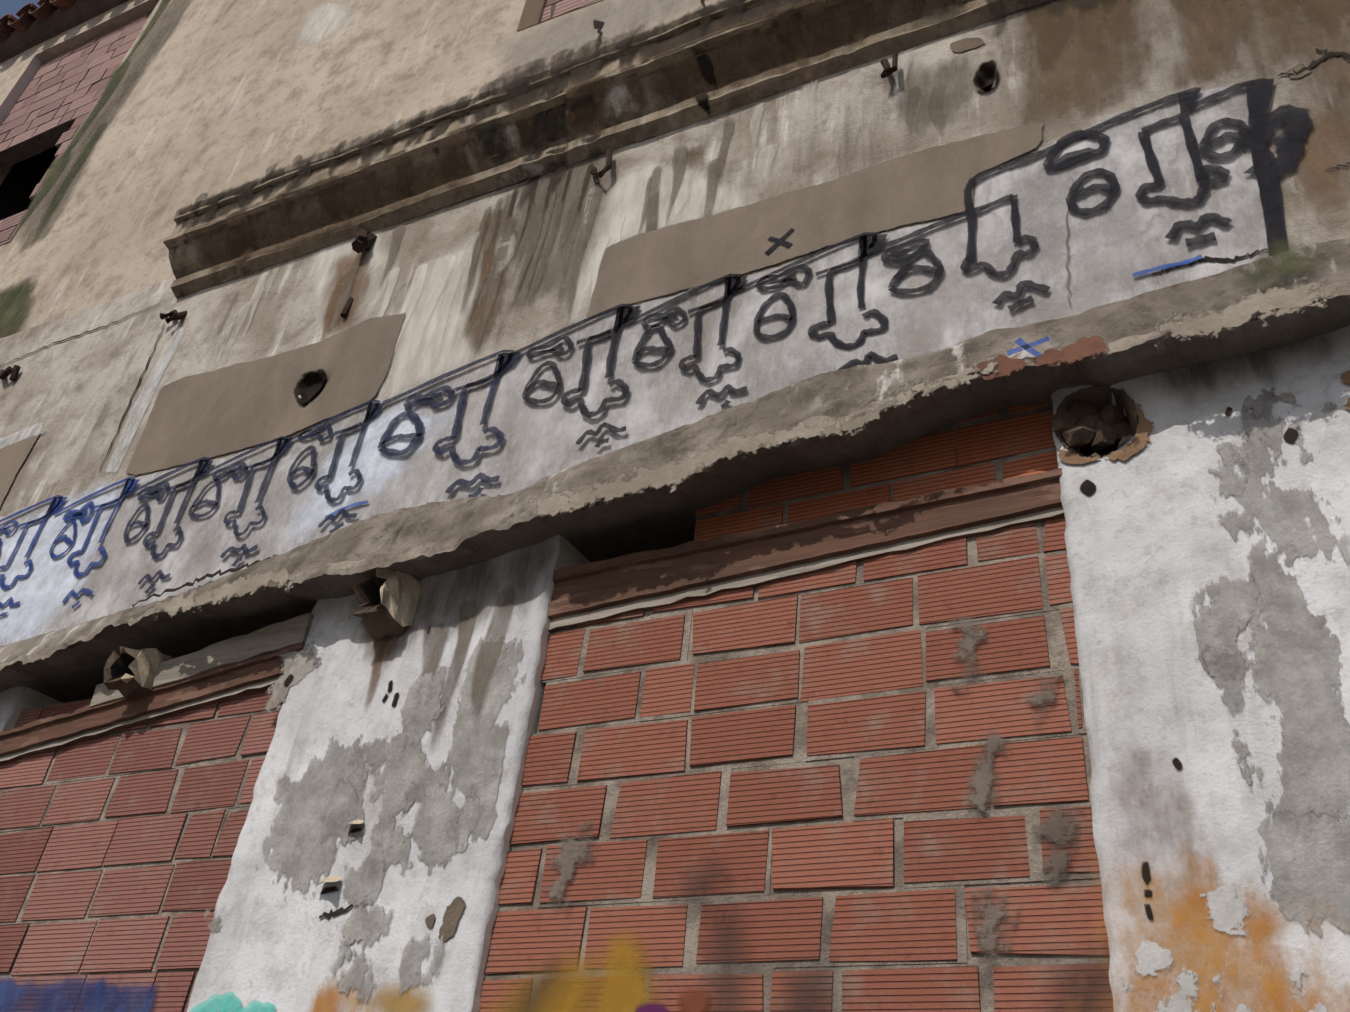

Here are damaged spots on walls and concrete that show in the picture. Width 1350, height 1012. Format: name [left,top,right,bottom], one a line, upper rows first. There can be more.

damp [1021,0,1129,118]
damp [1173,0,1350,86]
crack [1277,48,1350,76]
damp [179,0,966,397]
spalling [528,336,1110,517]
hole [1051,385,1155,496]
spalling [1322,371,1350,420]
peeling [1192,387,1350,938]
peeling [256,637,526,1003]